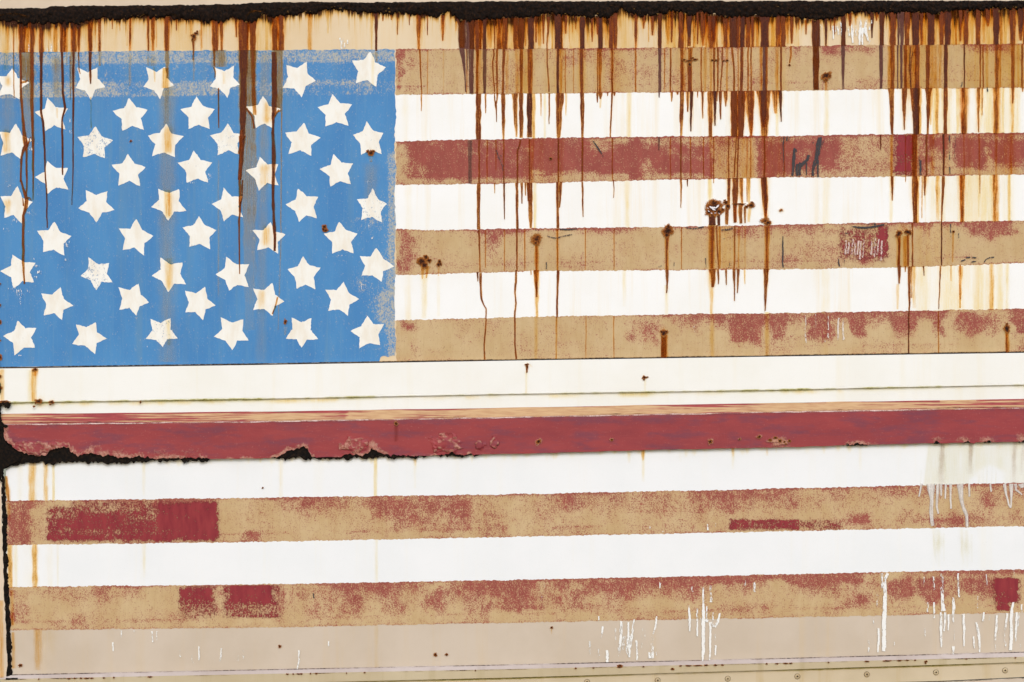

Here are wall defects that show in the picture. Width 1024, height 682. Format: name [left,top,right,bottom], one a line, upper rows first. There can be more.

corrosion [0,0,1024,373]
corrosion [0,469,22,680]